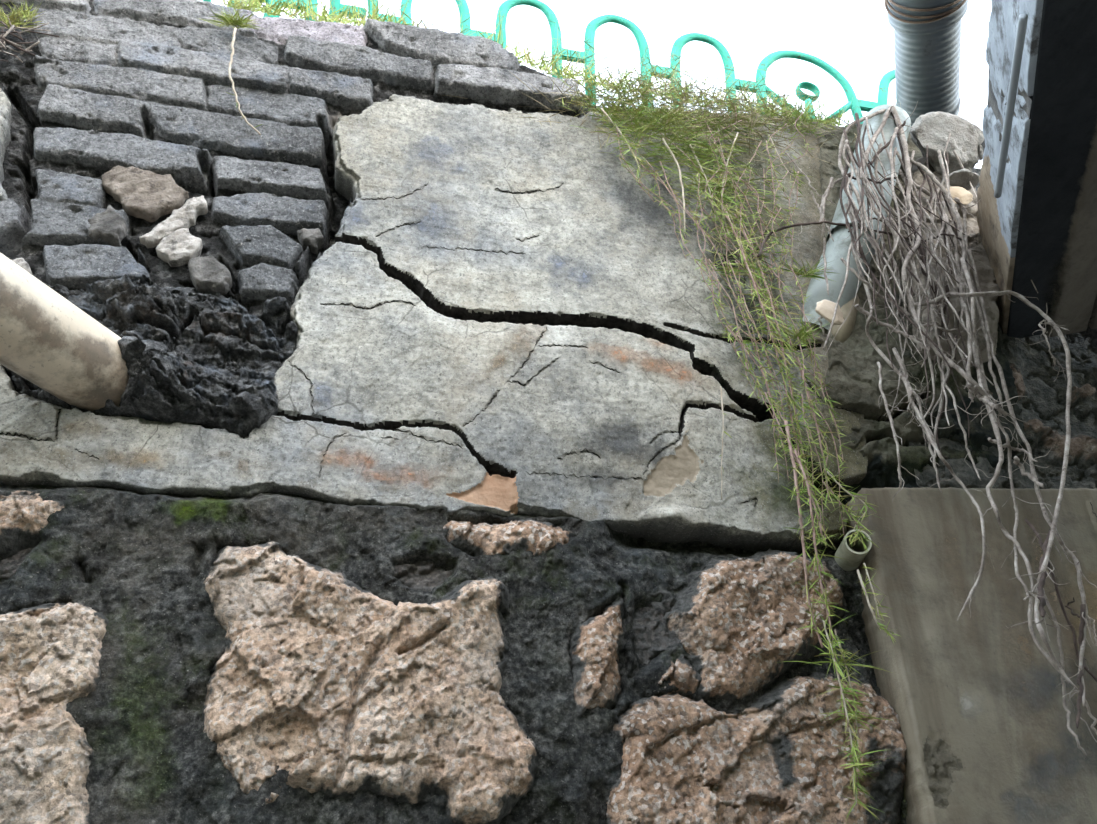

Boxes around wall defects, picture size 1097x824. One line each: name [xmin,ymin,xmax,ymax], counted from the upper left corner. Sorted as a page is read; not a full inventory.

spalling [297,228,324,254]
spalling [3,165,298,439]
crack [277,183,844,493]
crack [0,409,100,460]
crack [805,377,918,447]